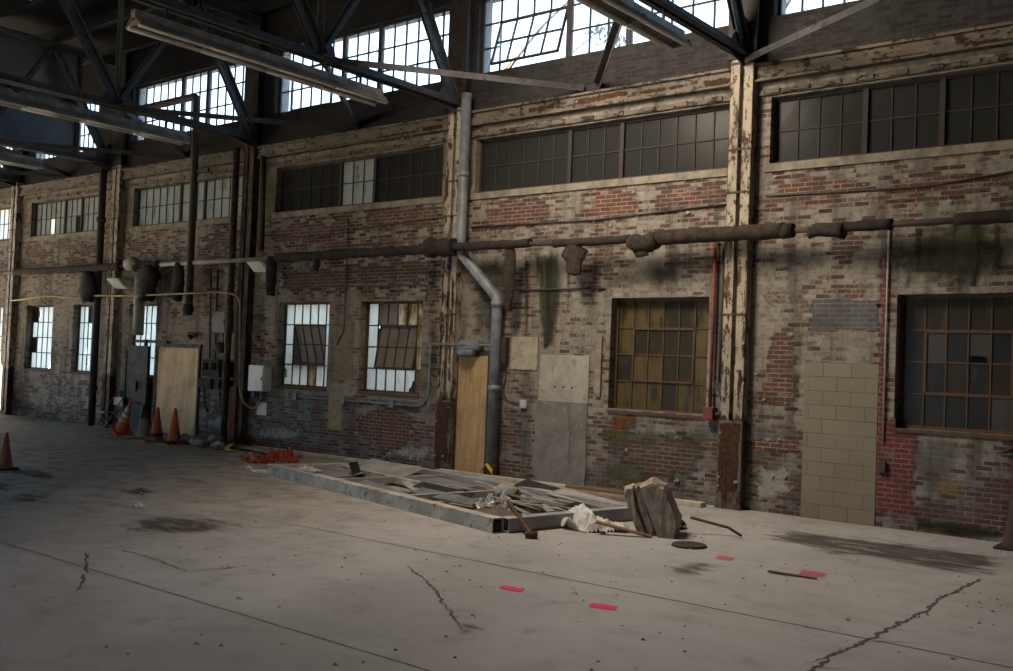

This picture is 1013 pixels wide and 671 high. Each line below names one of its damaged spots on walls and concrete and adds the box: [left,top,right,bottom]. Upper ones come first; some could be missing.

damp [525,254,569,347]
peeling [754,323,800,411]
crack [77,553,95,590]
crack [409,567,462,629]
crack [805,579,981,671]